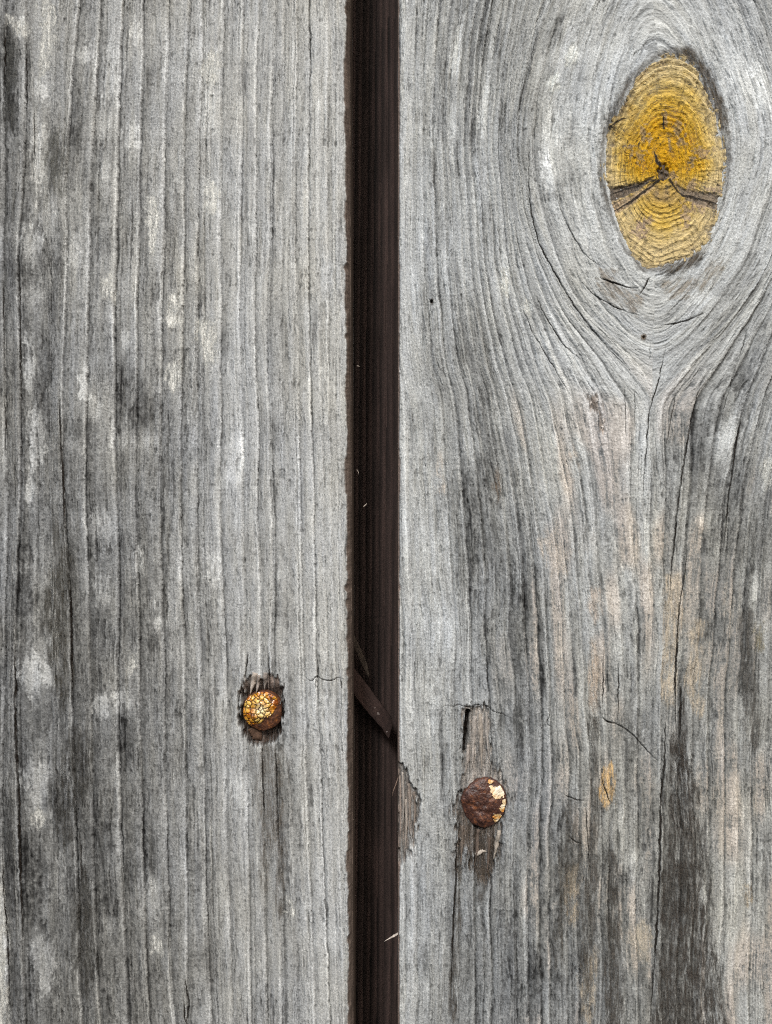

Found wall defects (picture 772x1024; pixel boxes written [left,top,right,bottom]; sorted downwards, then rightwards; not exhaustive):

crack [523,144,717,1024]